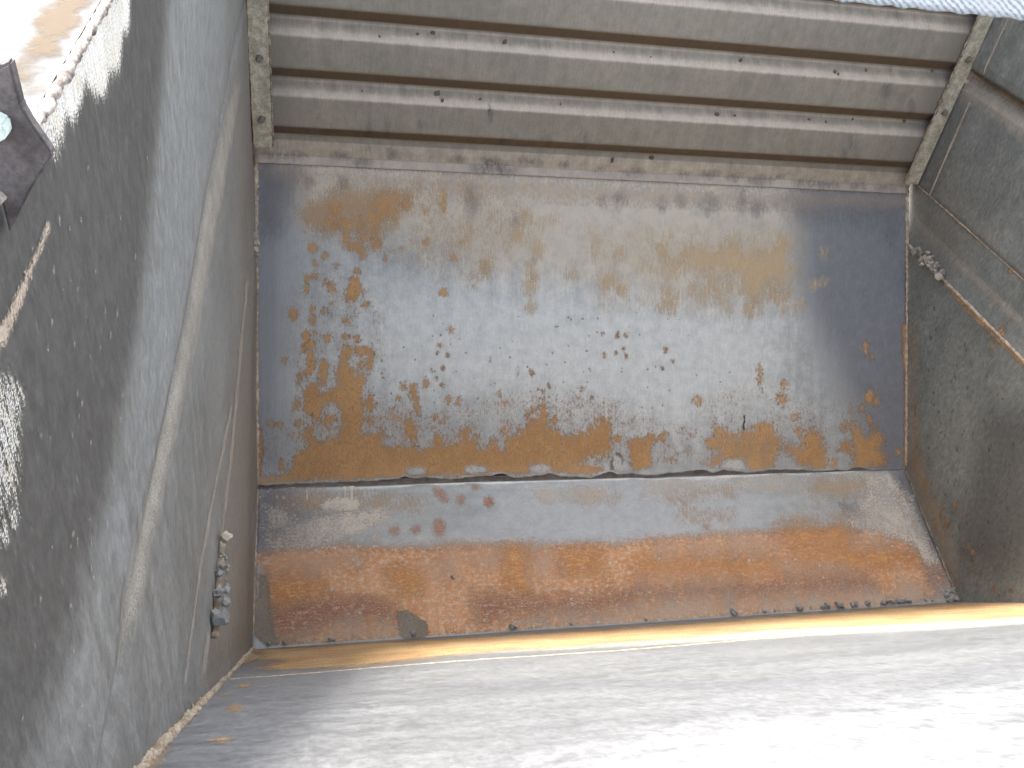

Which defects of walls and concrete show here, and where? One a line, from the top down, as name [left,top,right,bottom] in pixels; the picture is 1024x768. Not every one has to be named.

rust [240,189,1024,670]
peeling [609,452,630,472]
peeling [406,467,425,475]
peeling [464,465,487,474]
peeling [529,463,551,474]